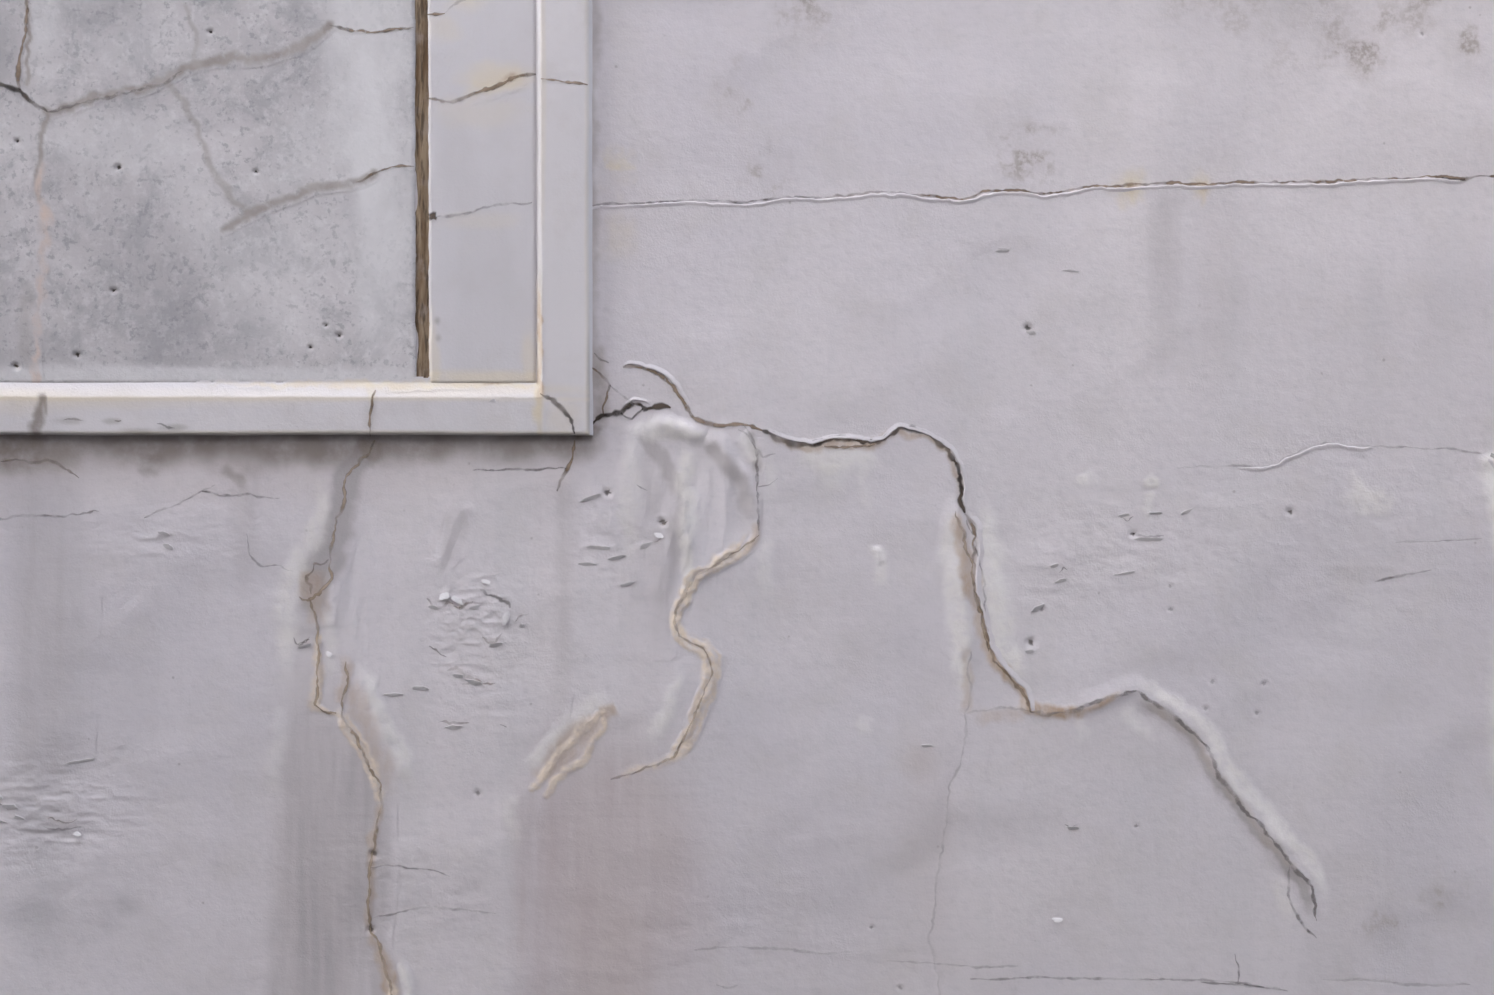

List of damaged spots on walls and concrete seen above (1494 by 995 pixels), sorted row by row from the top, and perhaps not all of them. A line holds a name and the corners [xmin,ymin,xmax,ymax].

crack [0,0,445,236]
crack [592,175,1494,209]
damp [0,390,102,872]
damp [218,435,418,995]
crack [300,392,382,791]
crack [366,829,431,987]
damp [499,336,882,995]
crack [535,360,1317,934]
crack [1238,443,1373,472]